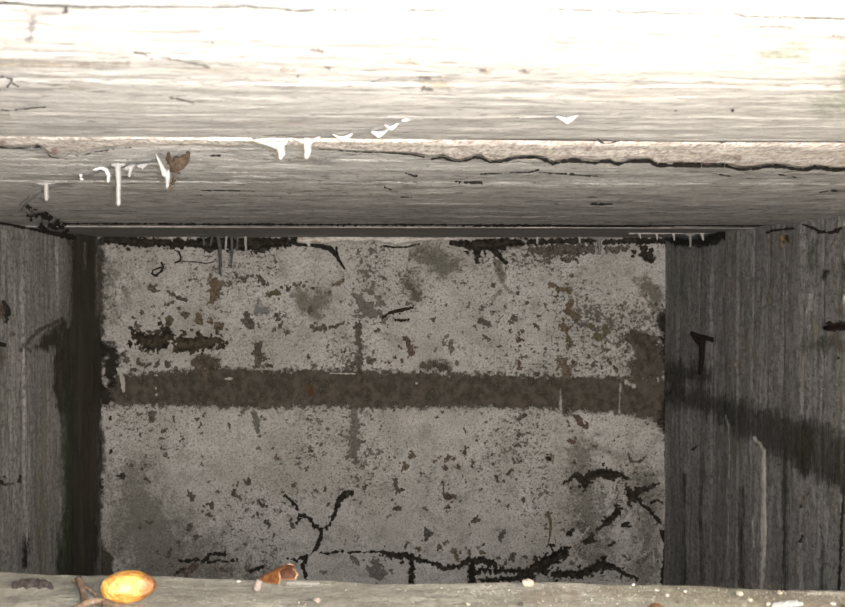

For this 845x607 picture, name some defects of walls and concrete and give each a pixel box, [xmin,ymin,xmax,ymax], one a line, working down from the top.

crack [251,115,845,193]
crack [519,111,619,119]
crack [0,146,845,270]
leakage [22,234,845,590]
crack [545,511,553,548]
crack [635,497,665,585]